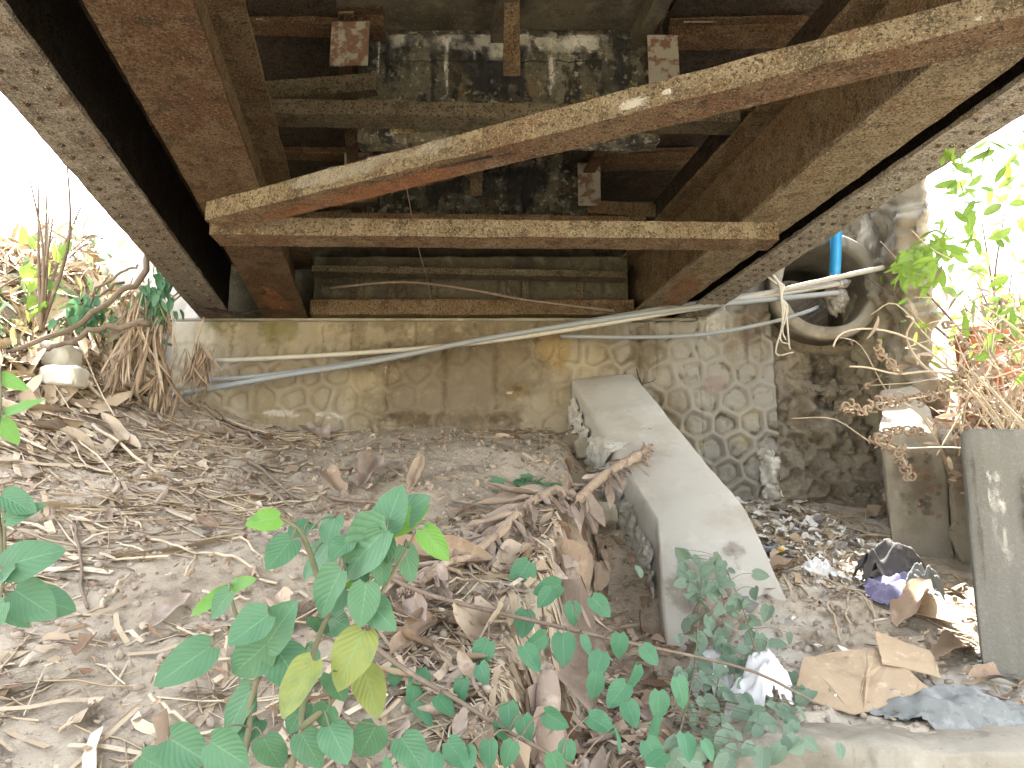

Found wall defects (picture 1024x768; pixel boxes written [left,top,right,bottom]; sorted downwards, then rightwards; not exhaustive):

leakage [366,33,527,102]
leakage [612,38,626,91]
leakage [424,153,549,215]
peeling [568,396,655,599]